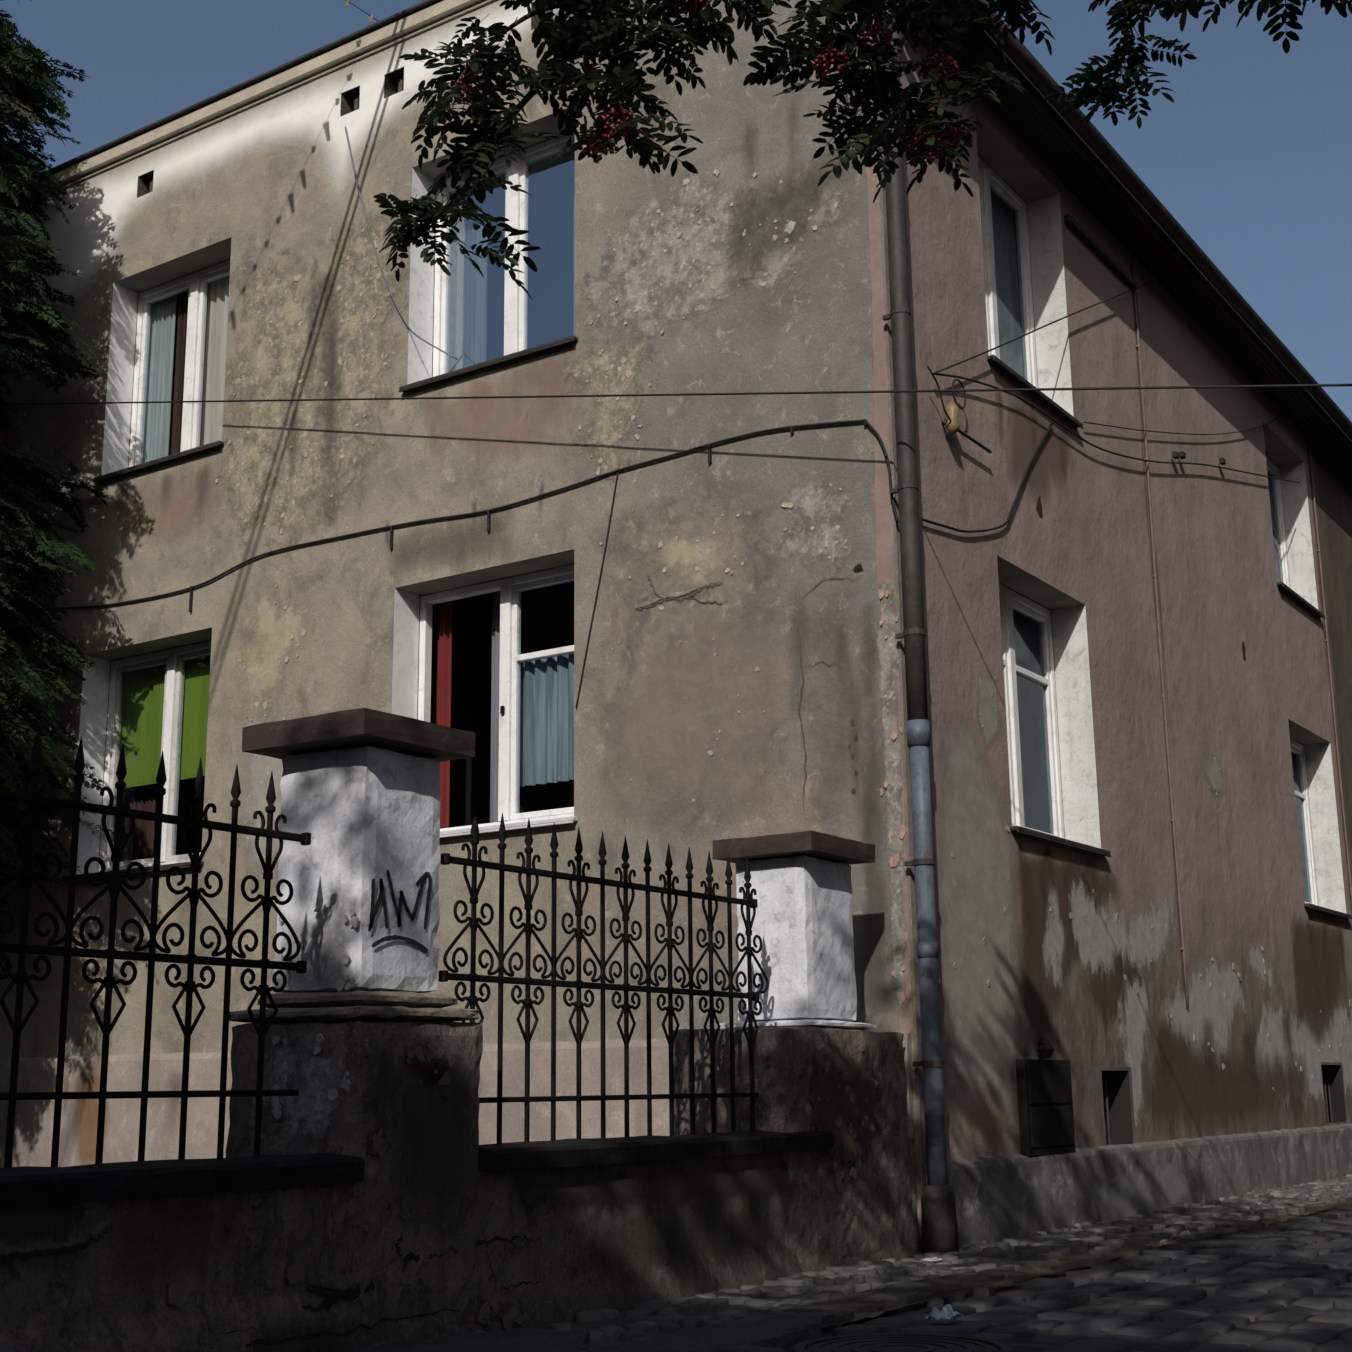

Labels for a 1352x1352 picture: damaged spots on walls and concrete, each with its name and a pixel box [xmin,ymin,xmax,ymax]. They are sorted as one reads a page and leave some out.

crack [635,575,725,611]
crack [796,576,858,810]
peeling [876,582,911,1005]
flaking render [254,1033,351,1146]
flaking render [1043,880,1352,1127]
crack [0,1214,112,1267]